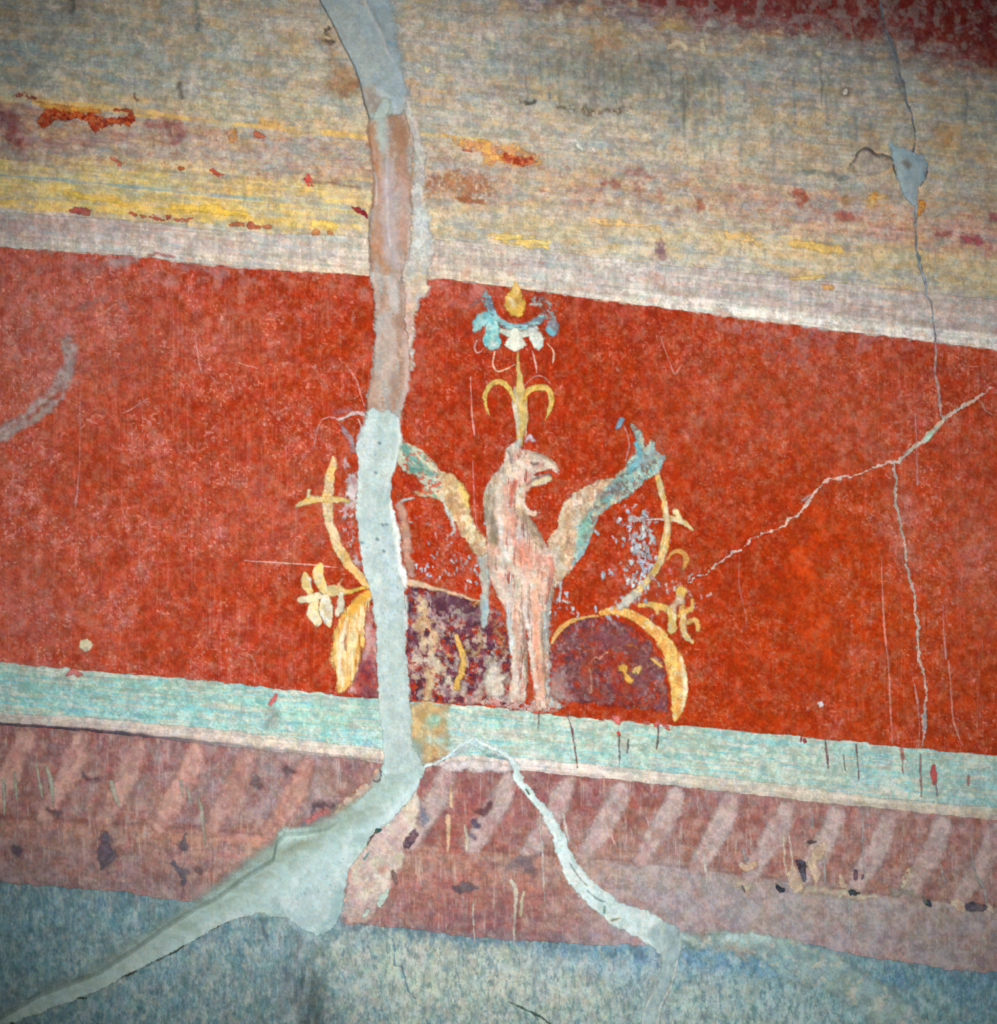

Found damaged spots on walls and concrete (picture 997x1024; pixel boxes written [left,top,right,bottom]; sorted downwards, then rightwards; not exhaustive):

peeling [15,93,185,144]
peeling [425,133,542,204]
flaking render [849,142,928,217]
crack [879,1,916,153]
crack [0,0,683,1024]
crack [688,204,993,746]